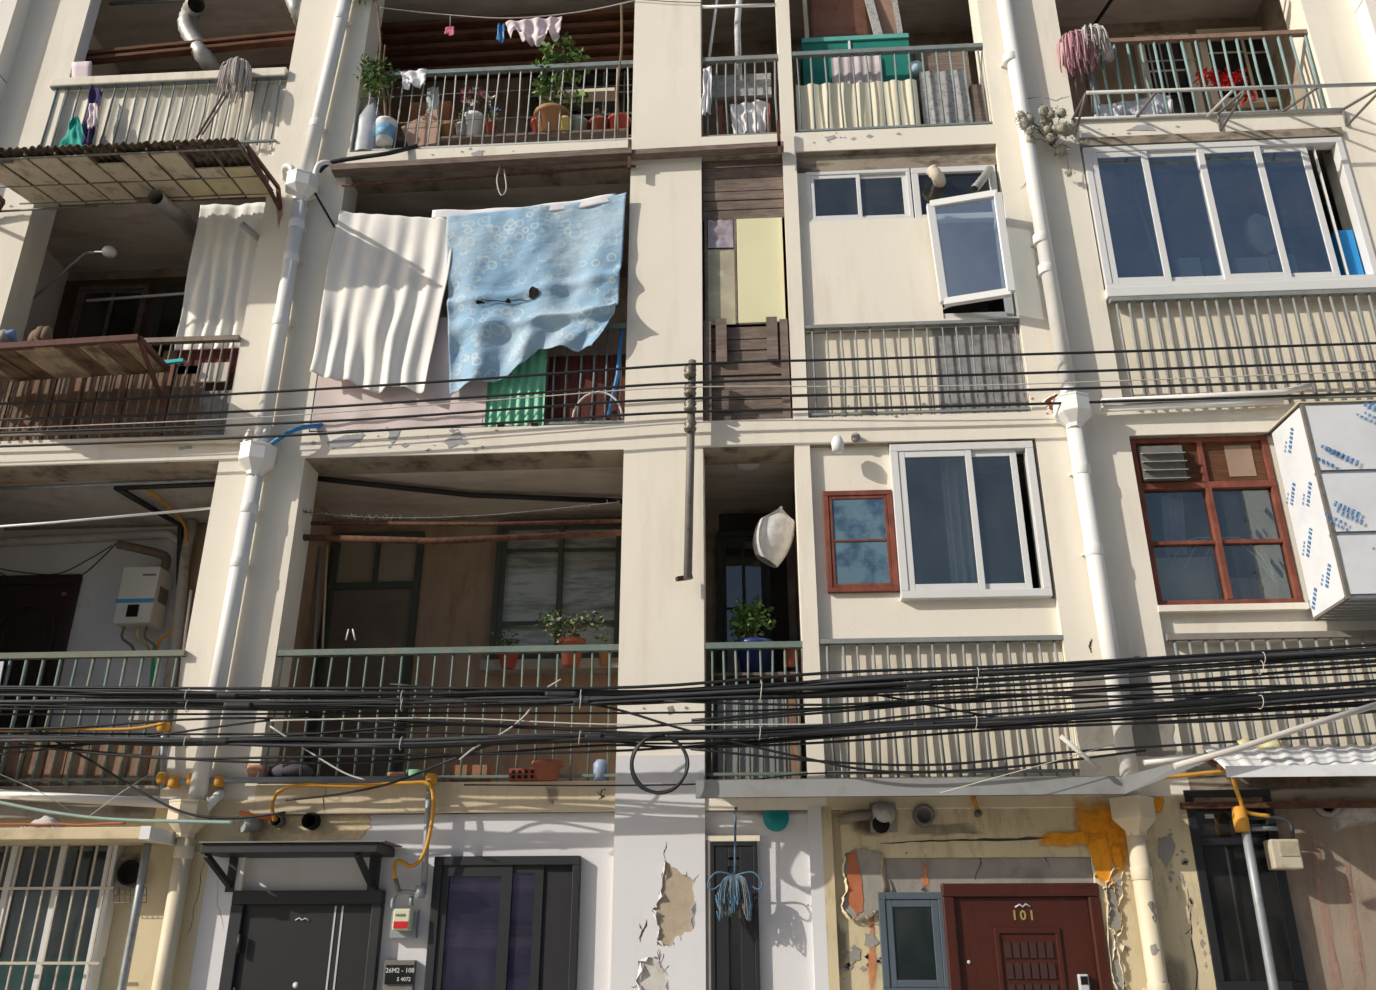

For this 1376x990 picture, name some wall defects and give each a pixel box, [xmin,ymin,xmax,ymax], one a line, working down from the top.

peeling [311,427,409,449]
peeling [426,428,486,452]
flaking render [631,860,698,990]
peeling [841,847,886,971]
peeling [1095,866,1130,990]
crack [1184,894,1198,990]